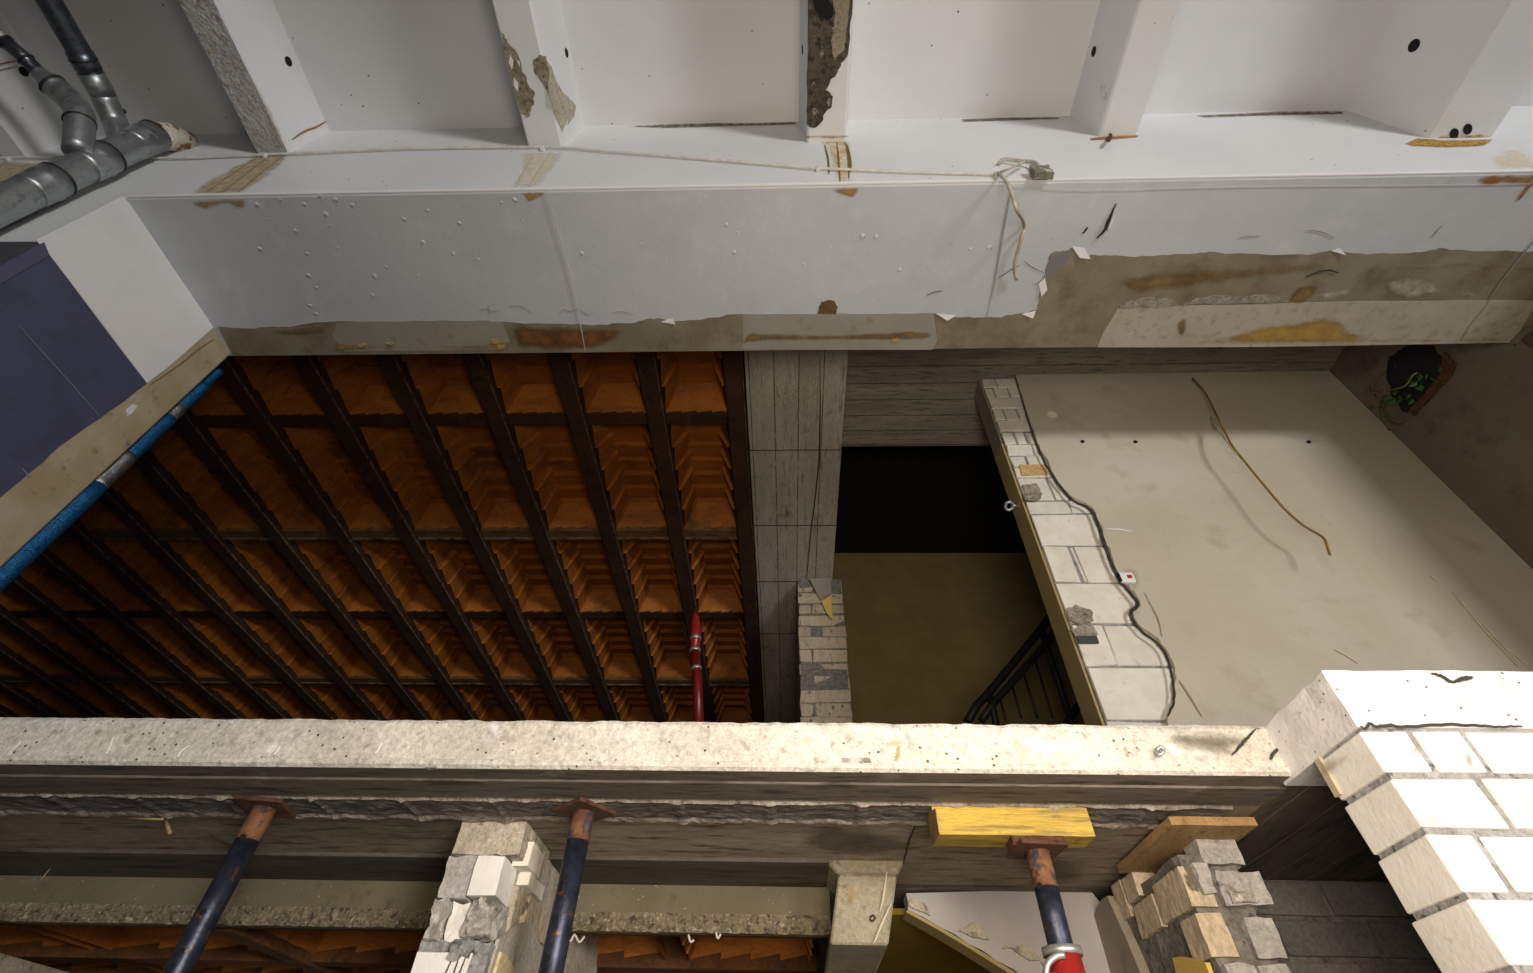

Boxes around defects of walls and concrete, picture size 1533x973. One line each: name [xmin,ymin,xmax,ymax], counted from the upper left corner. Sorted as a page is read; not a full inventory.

peeling [501,32,576,132]
peeling [806,0,853,128]
rust [1480,152,1533,200]
peeling [218,246,1533,416]